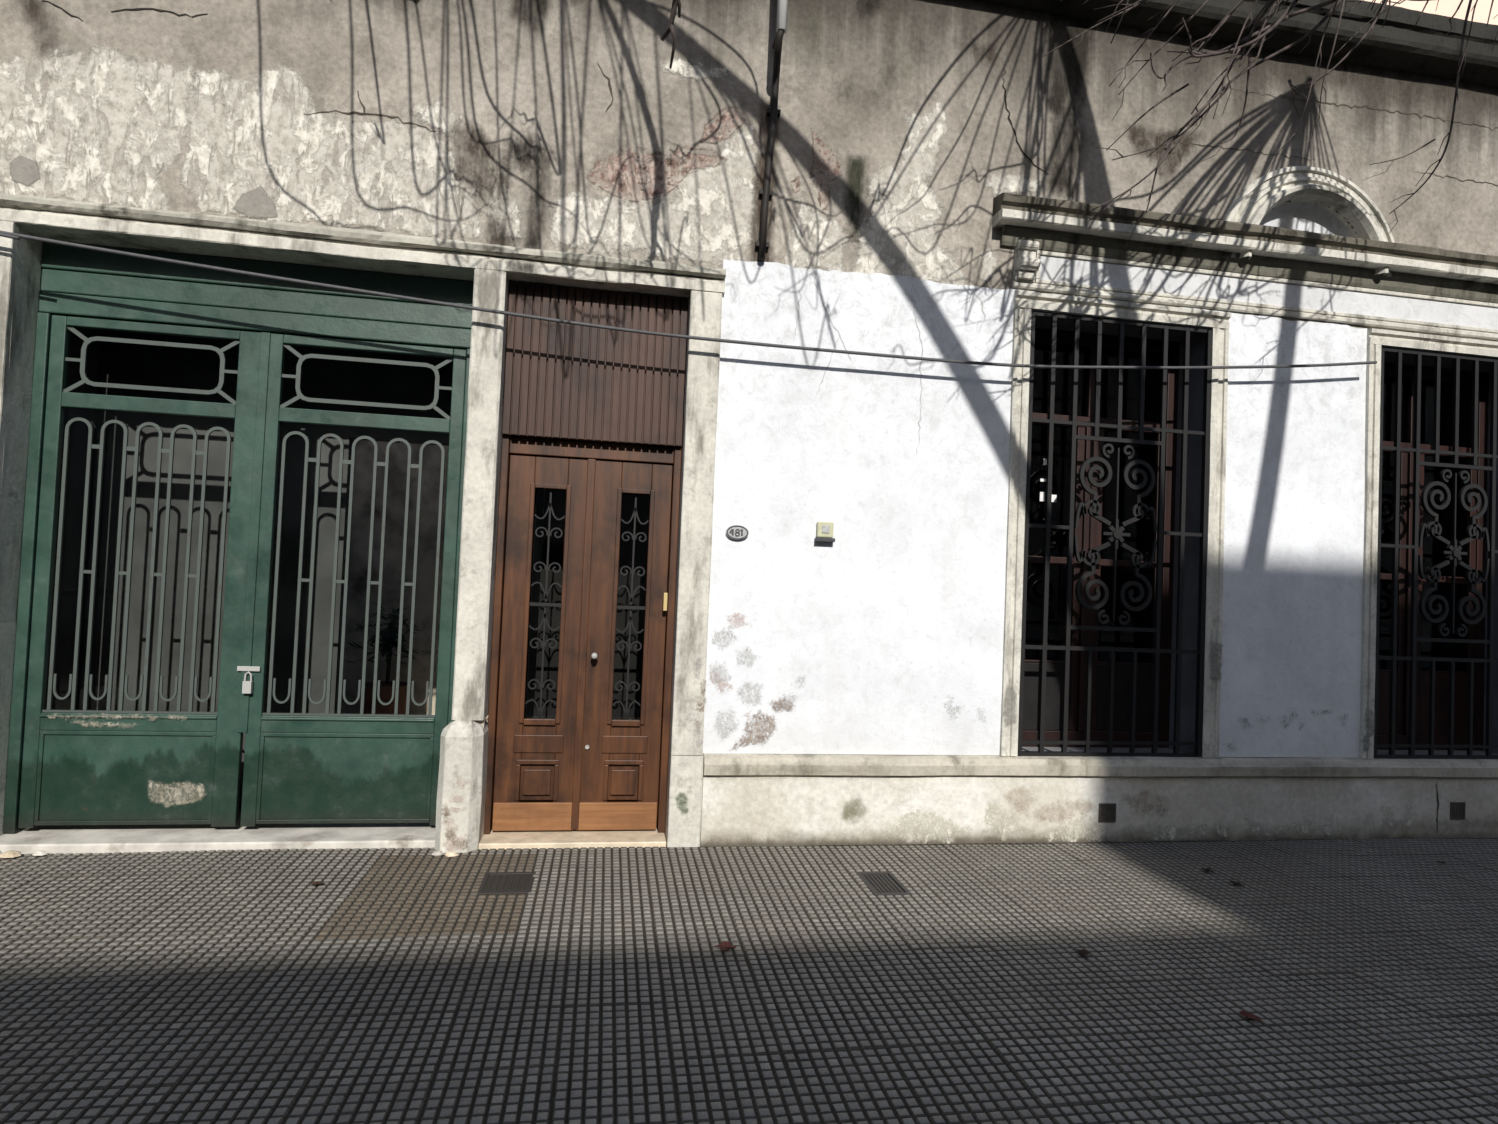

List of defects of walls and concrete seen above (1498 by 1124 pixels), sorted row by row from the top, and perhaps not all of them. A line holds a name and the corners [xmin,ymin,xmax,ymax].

crack [42,0,207,21]
leakage [515,0,548,27]
peeling [659,58,728,81]
peeling [0,45,522,240]
leakage [458,126,508,245]
leakage [511,139,544,273]
peeling [548,106,758,266]
peeling [784,101,997,285]
peeling [984,171,1041,197]
leakage [1000,14,1498,304]
peeling [688,669,792,750]